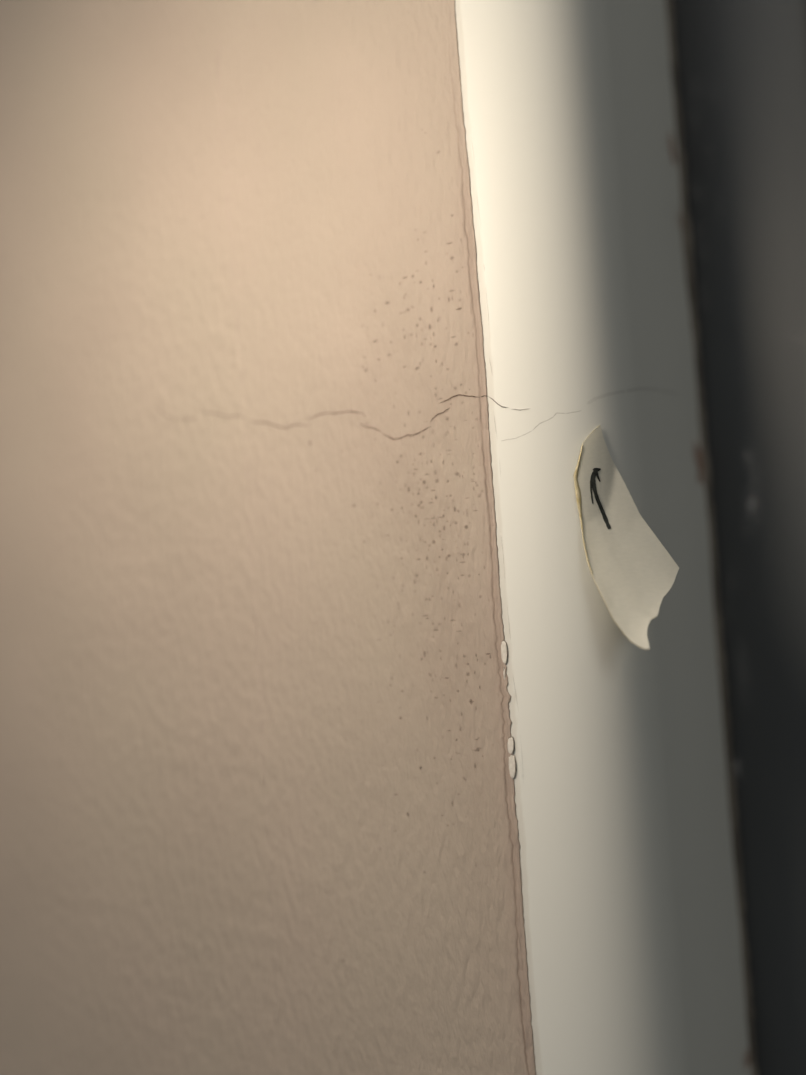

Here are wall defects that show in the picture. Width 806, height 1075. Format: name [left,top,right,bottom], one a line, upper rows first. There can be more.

crack [205,394,525,440]